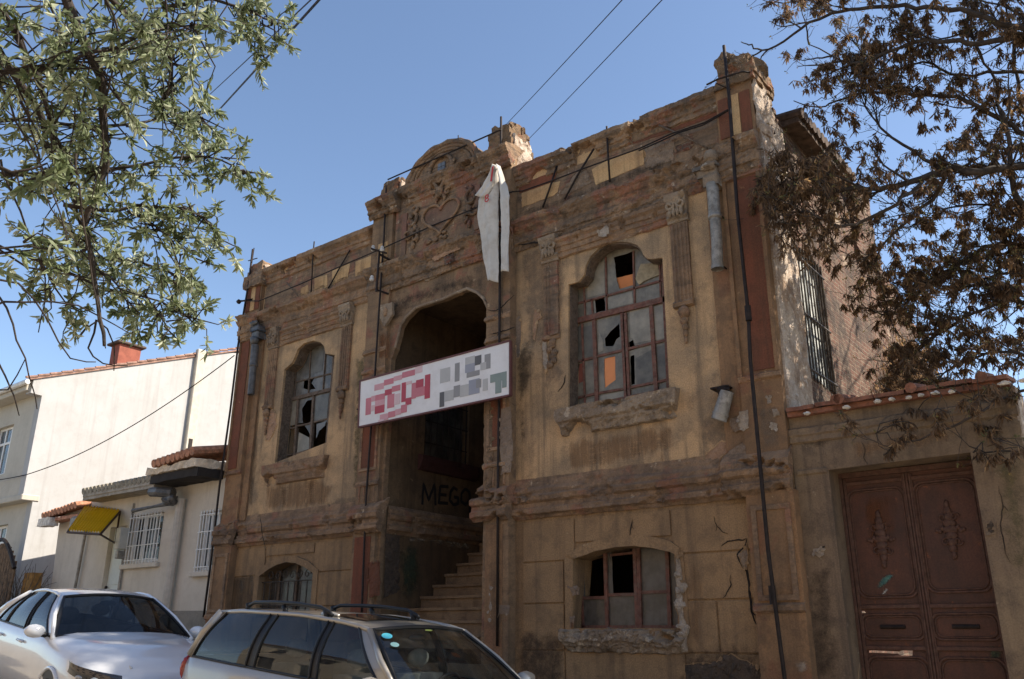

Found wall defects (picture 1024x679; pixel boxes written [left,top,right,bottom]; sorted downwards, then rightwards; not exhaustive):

crack [714,518,756,624]
crack [998,486,1011,563]